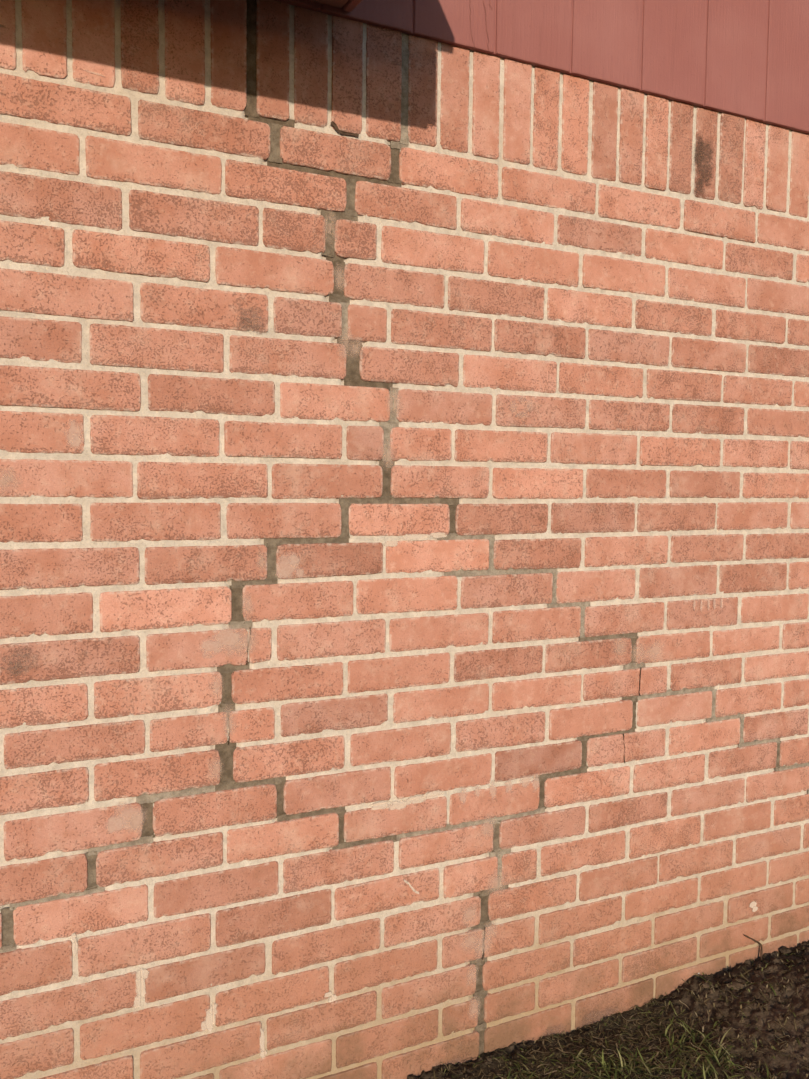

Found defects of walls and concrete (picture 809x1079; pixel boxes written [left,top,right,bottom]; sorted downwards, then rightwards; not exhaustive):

crack [229,0,646,679]
leakage [695,139,713,194]
crack [0,657,809,1055]